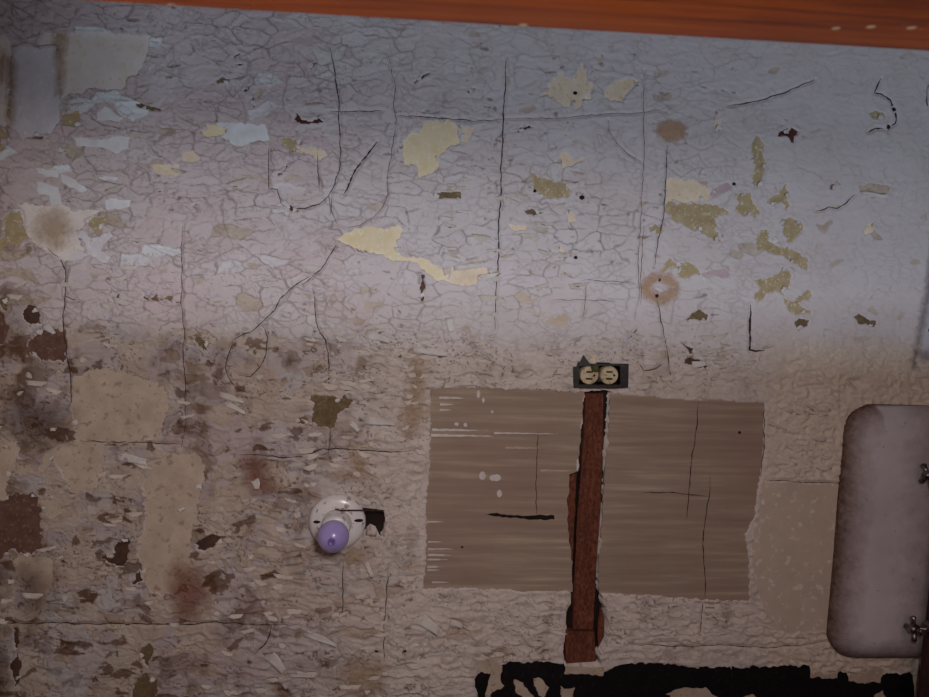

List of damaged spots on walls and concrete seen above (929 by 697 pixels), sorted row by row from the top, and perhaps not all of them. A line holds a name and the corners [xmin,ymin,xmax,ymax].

flaking render [0,31,152,152]
crack [728,80,814,106]
crack [868,79,897,133]
crack [225,48,672,393]
peeling [0,282,68,362]
crack [47,247,75,410]
crack [85,227,187,447]
crack [749,305,764,352]
peeling [0,442,68,560]
flaking render [17,357,222,606]
flaking render [295,324,584,608]
flaking render [526,330,839,638]